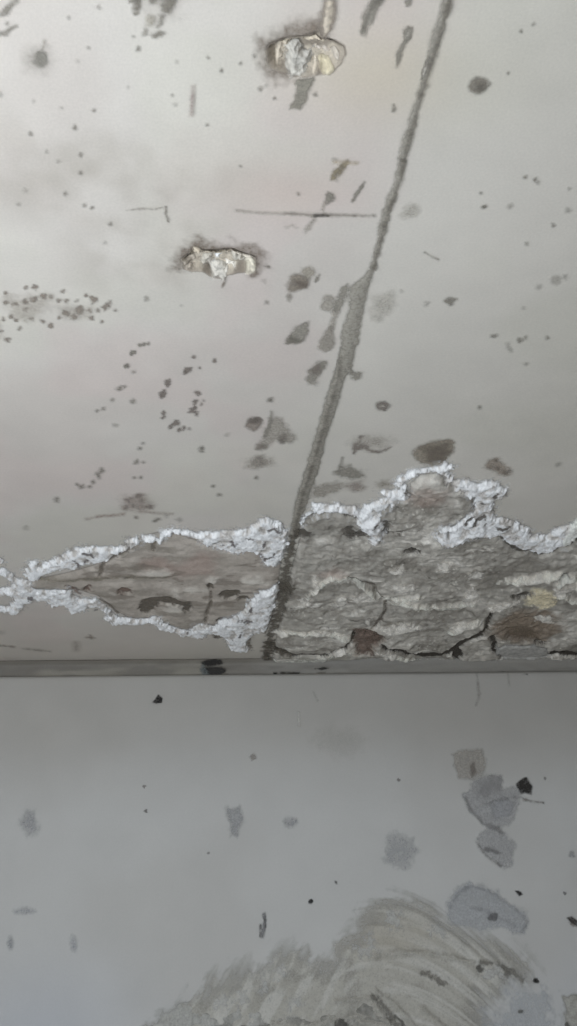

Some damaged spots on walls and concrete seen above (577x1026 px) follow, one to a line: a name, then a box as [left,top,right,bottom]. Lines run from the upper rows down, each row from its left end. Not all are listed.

spalling [261,0,345,109]
spalling [175,240,262,286]
crack [248,0,503,661]
leakage [299,440,577,554]
crack [41,551,175,613]
leakage [0,517,290,653]
spalling [31,473,577,663]
leakage [201,659,225,675]
crack [548,649,577,657]
spalling [480,960,539,983]